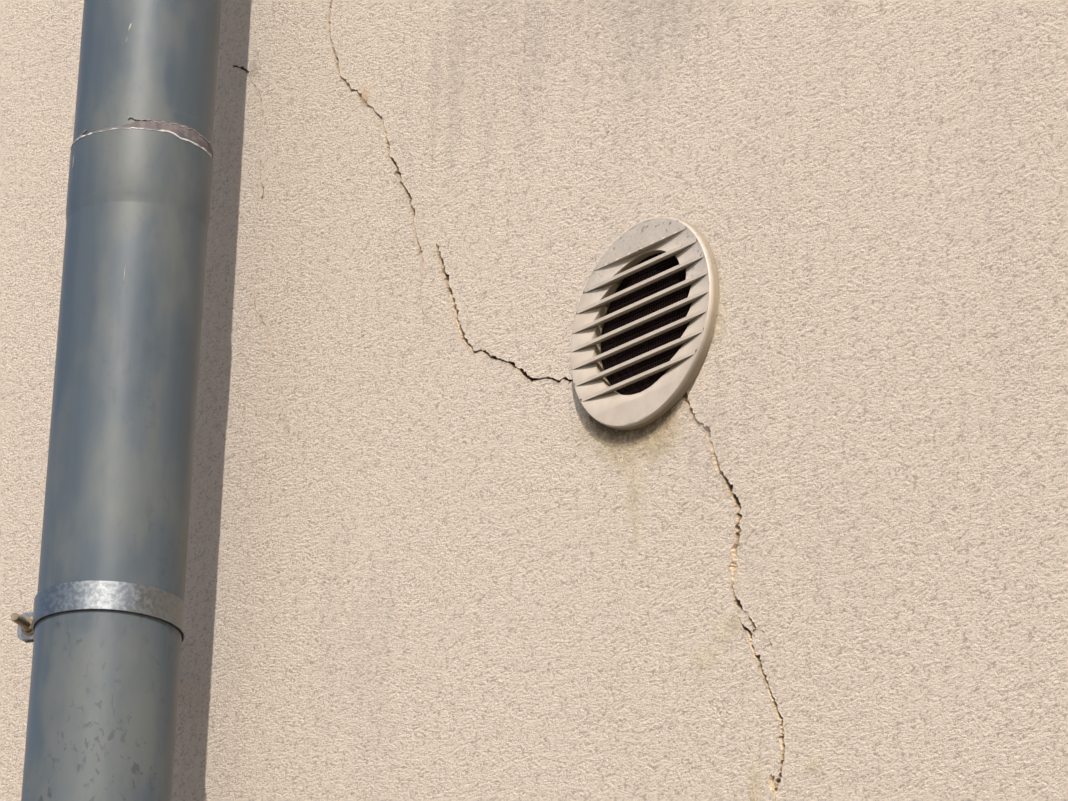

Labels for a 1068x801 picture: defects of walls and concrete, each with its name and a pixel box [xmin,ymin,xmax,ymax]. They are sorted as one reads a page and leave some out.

crack [328,0,573,384]
crack [682,391,787,801]